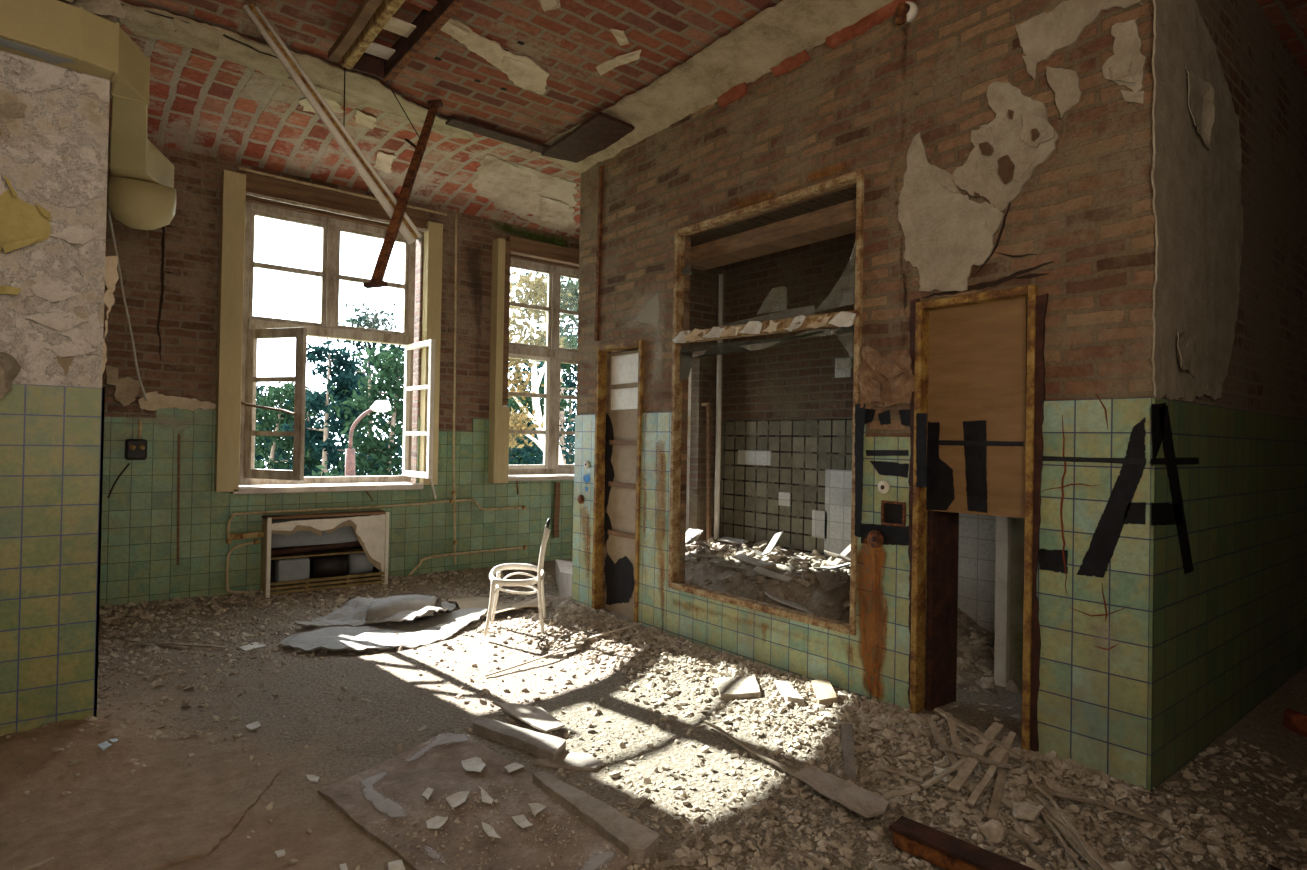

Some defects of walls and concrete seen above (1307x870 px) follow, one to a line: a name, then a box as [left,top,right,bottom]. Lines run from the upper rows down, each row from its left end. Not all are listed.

flaking render [65,0,475,140]
flaking render [440,18,550,94]
flaking render [538,0,561,12]
flaking render [596,29,641,76]
spalling [717,82,747,108]
spalling [770,50,811,78]
spalling [826,0,918,50]
flaking render [373,152,396,173]
flaking render [471,154,578,236]
flaking render [898,0,1243,402]
flaking render [0,176,216,411]
corrosion [857,539,887,699]